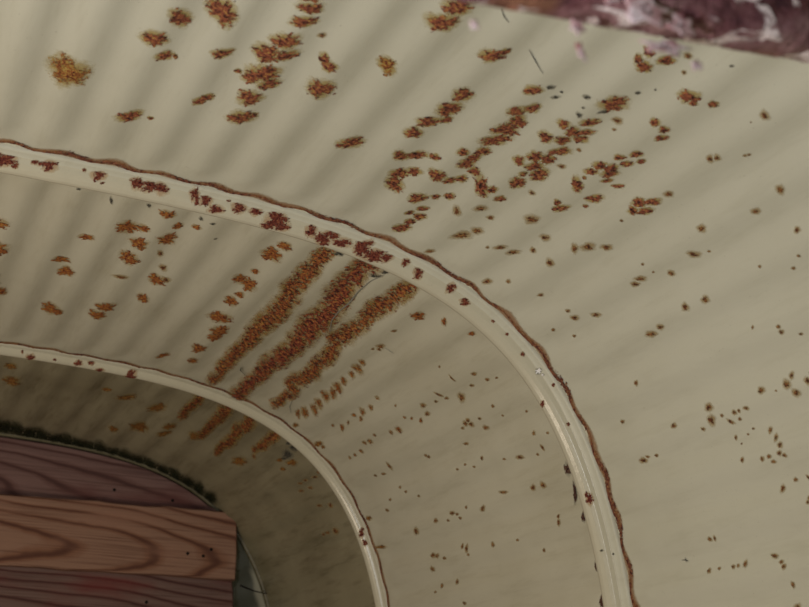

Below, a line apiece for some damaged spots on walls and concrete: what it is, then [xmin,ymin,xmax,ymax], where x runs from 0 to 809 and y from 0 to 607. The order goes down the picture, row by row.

corrosion [169,8,191,27]
corrosion [205,0,238,29]
corrosion [48,52,91,86]
corrosion [141,31,177,61]
corrosion [212,49,234,59]
corrosion [306,53,337,99]
corrosion [377,56,396,77]
peeling [605,0,703,71]
corrosion [628,191,673,216]
corrosion [775,372,800,396]
corrosion [701,403,749,431]
corrosion [760,427,787,463]